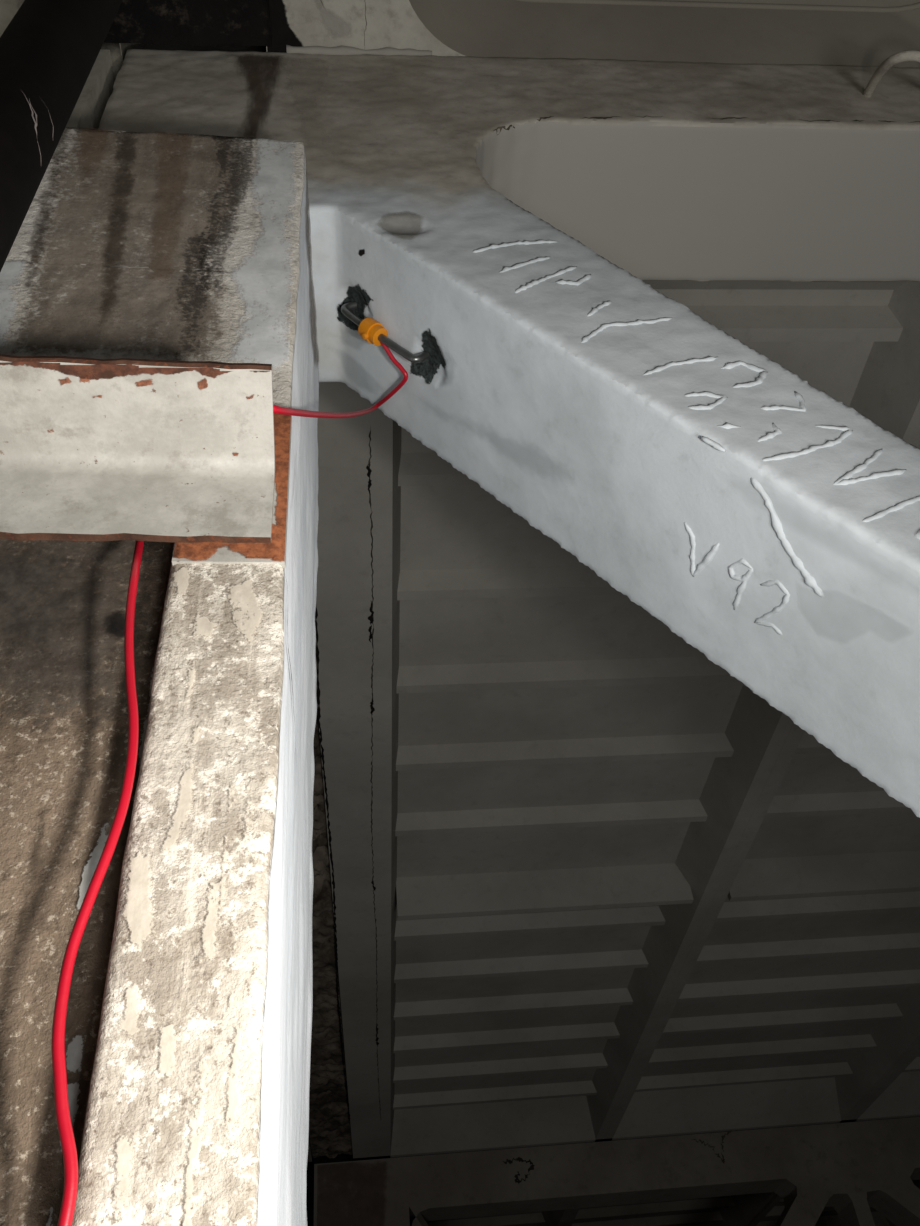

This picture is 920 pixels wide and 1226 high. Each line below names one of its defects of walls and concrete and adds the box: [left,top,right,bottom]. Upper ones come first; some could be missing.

damp [16,0,303,360]
rust [0,359,231,390]
rust [173,413,291,561]
crack [287,607,350,1122]
crack [366,426,381,1118]
crack [502,1157,534,1184]